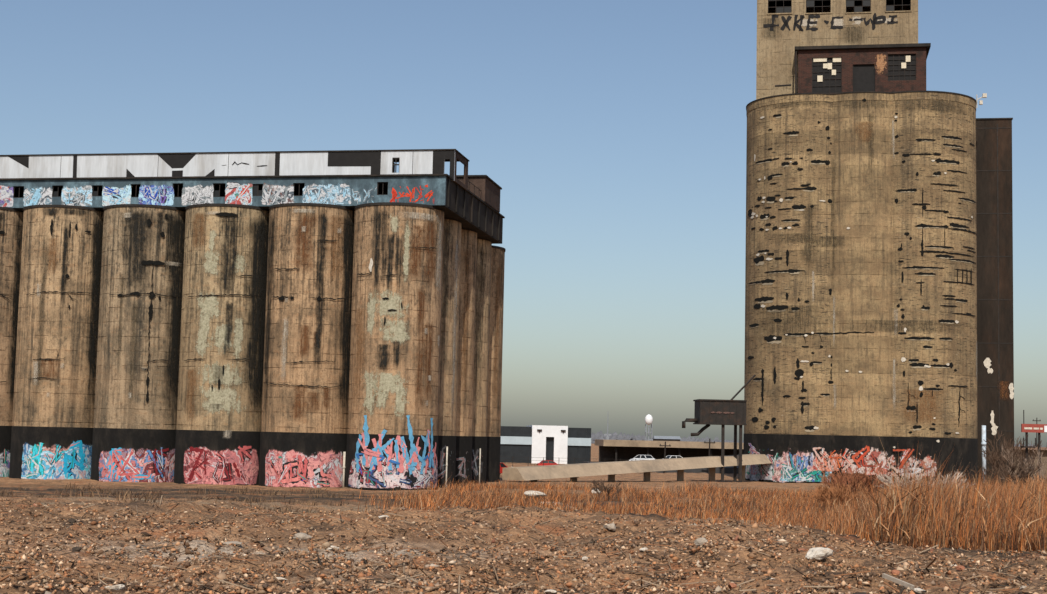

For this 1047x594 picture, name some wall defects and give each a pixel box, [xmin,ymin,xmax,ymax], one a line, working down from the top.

damp [9,220,23,402]
damp [34,269,45,380]
damp [61,227,69,297]
damp [88,218,103,404]
peeling [204,230,220,275]
peeling [196,292,246,414]
peeling [234,254,246,273]
damp [297,209,354,406]
peeling [364,371,409,416]
spalling [748,121,832,231]
spalling [897,298,968,442]
spalling [894,136,977,324]